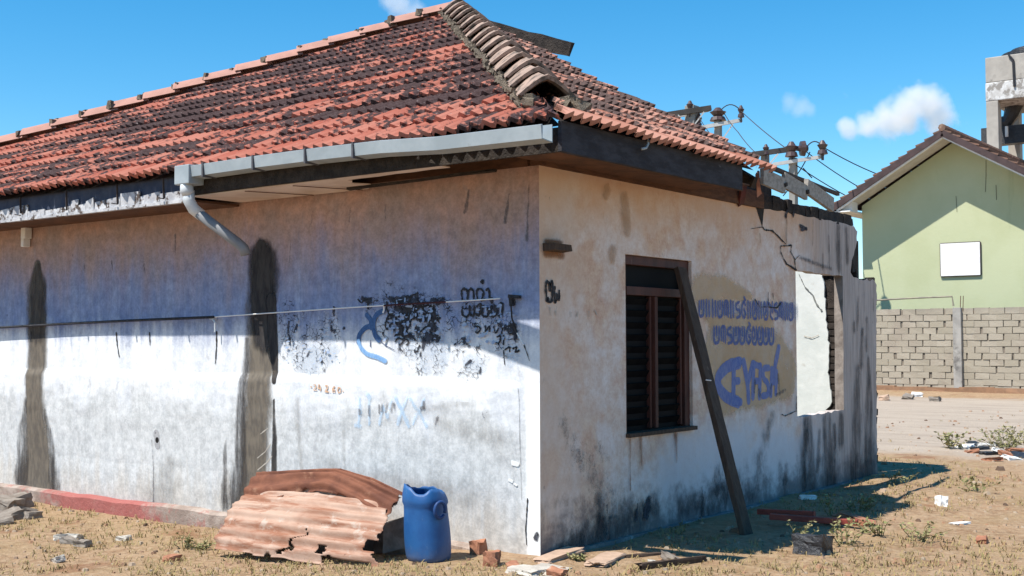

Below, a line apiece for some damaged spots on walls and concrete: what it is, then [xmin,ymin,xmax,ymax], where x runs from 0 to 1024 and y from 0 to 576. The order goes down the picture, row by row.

leakage [17,260,55,490]
leakage [223,239,278,509]
peeling [359,283,519,379]
crack [752,208,822,338]
leakage [802,315,872,492]